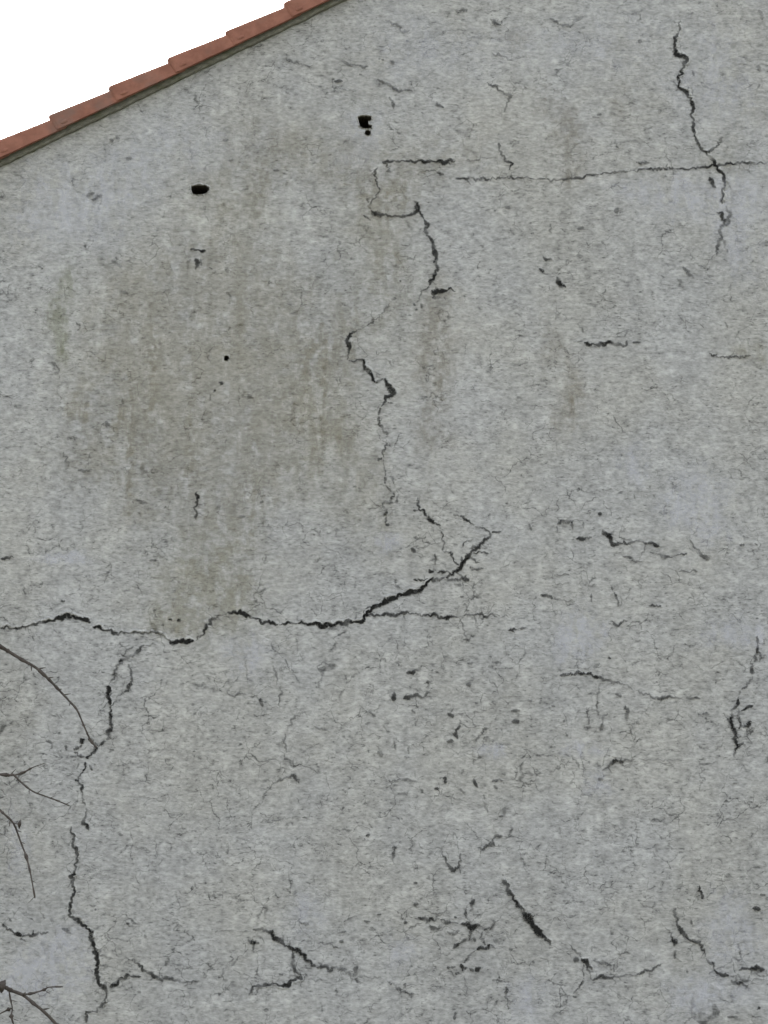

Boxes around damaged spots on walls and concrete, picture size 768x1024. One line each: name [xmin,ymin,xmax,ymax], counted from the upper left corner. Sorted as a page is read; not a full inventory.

crack [363,20,764,298]
crack [190,248,212,269]
crack [345,322,397,427]
crack [584,339,640,347]
crack [0,458,517,652]
crack [558,512,707,560]
crack [79,678,133,792]
crack [729,618,761,753]
crack [68,820,174,1023]
crack [249,923,358,997]
crack [502,878,553,963]
crack [573,918,765,998]